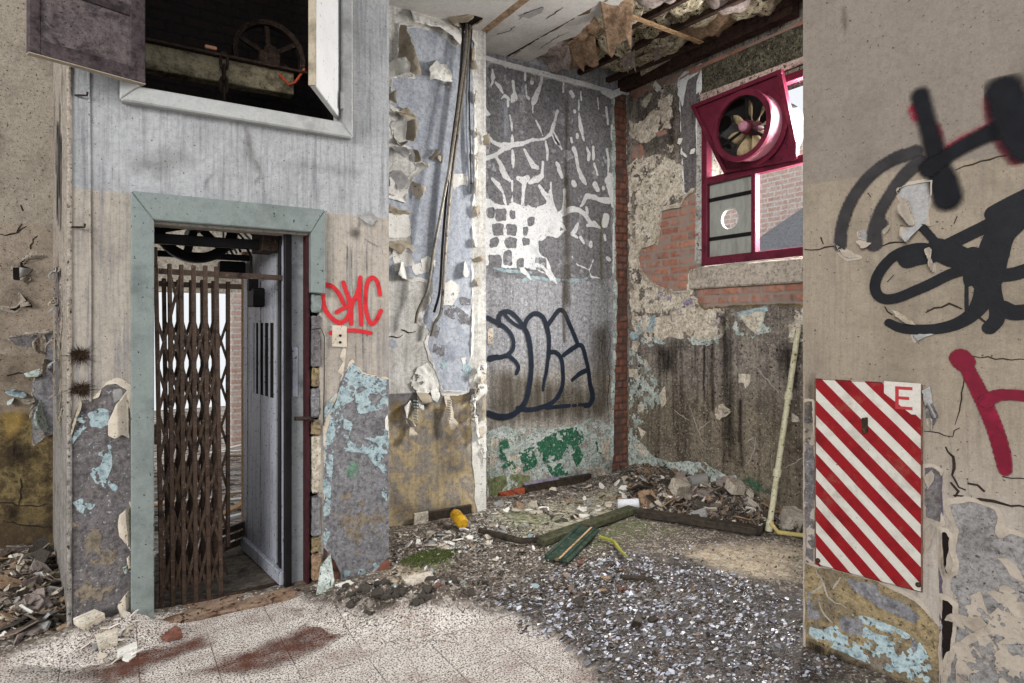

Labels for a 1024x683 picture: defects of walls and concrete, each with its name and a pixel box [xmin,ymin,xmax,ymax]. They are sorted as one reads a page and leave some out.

peeling [0,251,131,625]
peeling [310,294,421,595]
peeling [359,10,803,512]
leakage [703,314,742,459]
peeling [791,398,1024,683]
crack [936,566,944,683]
crack [924,356,1024,527]